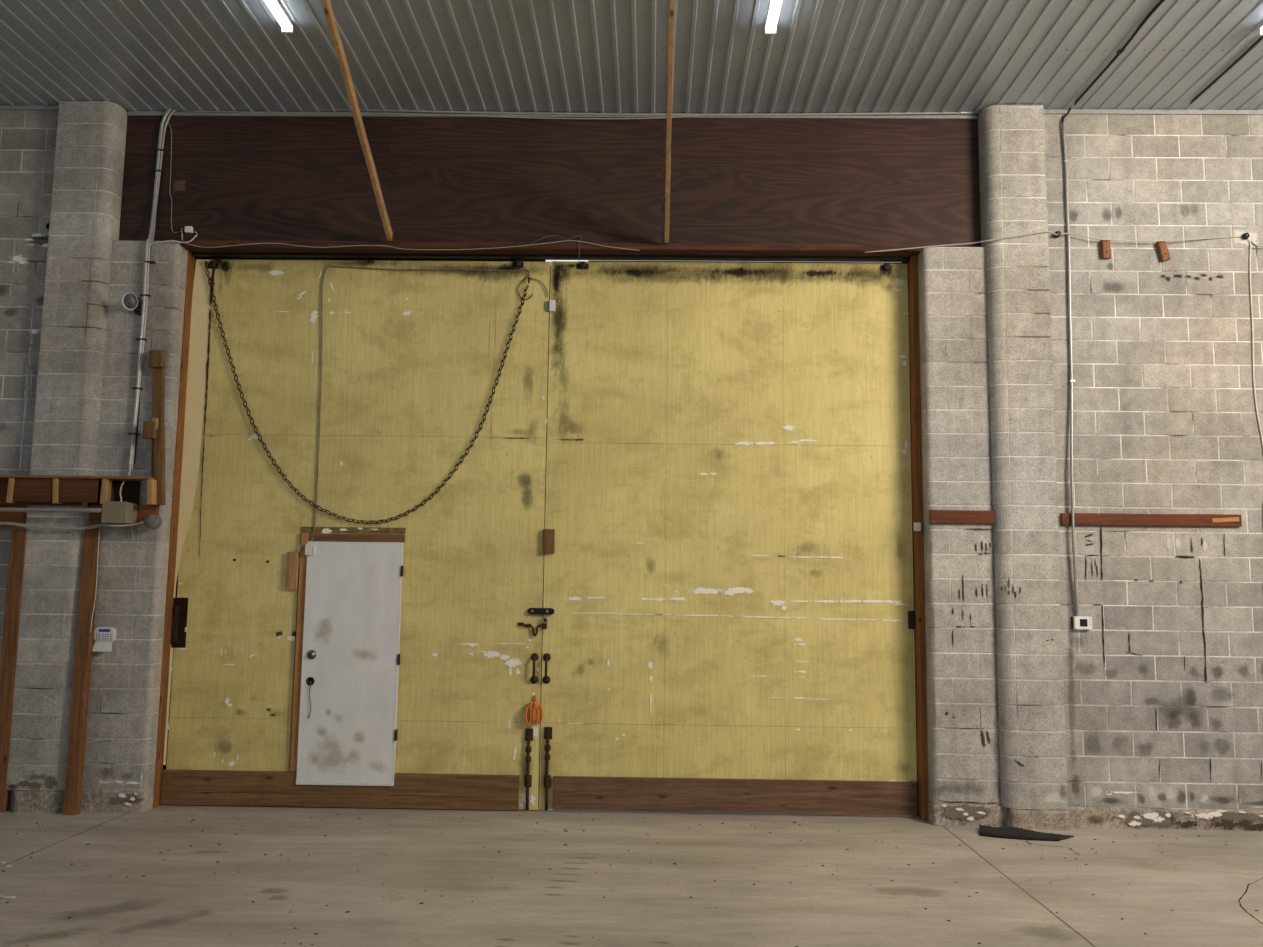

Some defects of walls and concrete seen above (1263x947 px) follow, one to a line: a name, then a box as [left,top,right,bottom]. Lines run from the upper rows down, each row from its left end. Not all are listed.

leakage [459,265,519,274]
leakage [554,264,577,291]
leakage [603,266,670,276]
leakage [710,266,791,278]
leakage [554,306,563,350]
peeling [782,425,817,444]
peeling [544,586,907,621]
peeling [458,639,532,676]
spalling [940,803,999,821]
spalling [1108,810,1263,829]